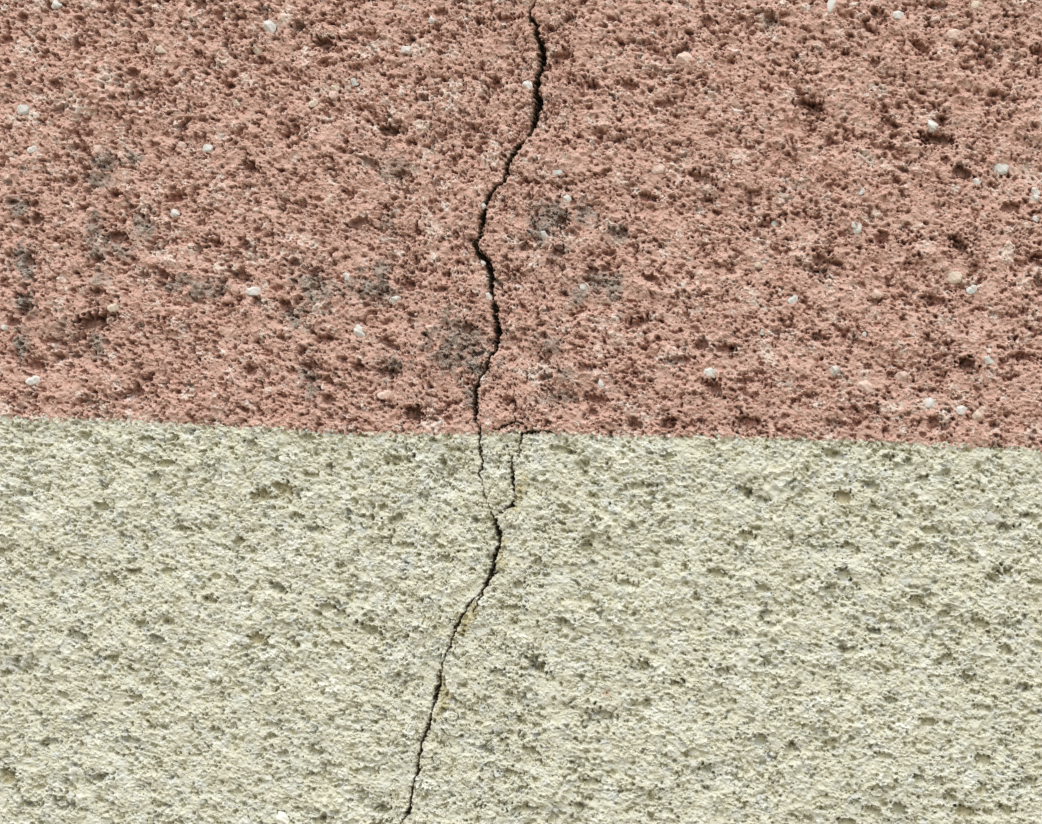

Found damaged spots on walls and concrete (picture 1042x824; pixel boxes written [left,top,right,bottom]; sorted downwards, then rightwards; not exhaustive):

crack [400,0,558,824]